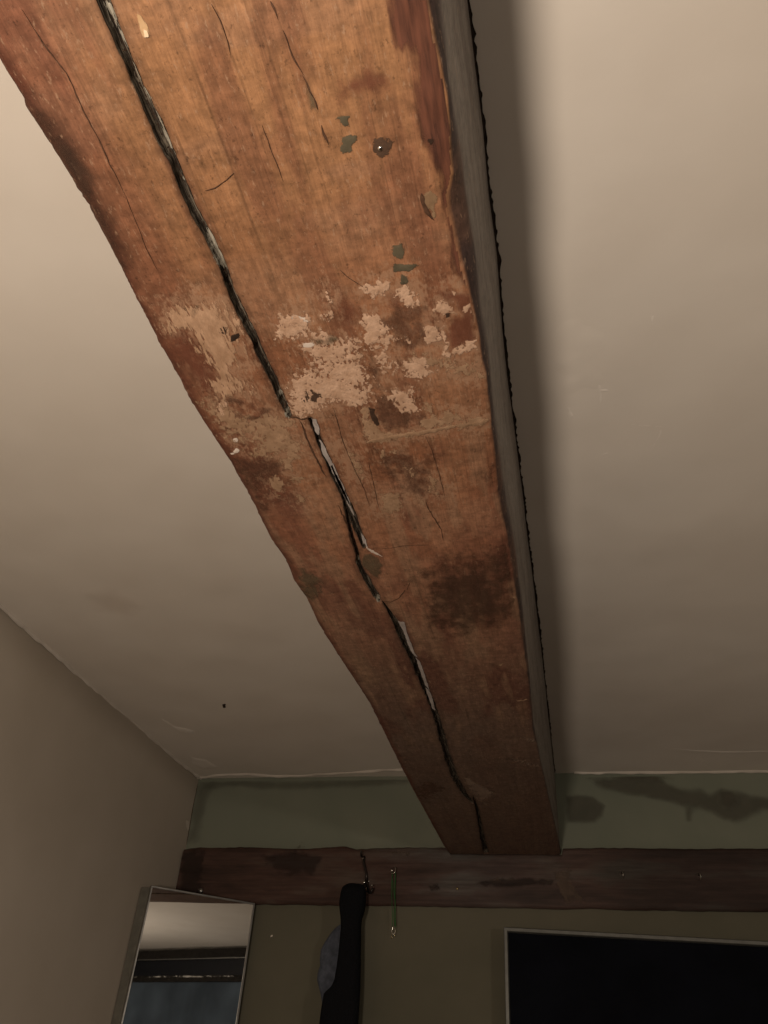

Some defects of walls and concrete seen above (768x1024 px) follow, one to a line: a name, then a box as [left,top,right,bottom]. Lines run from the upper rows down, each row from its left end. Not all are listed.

crack [96,0,489,853]
peeling [159,278,489,504]
water stain [600,777,768,818]